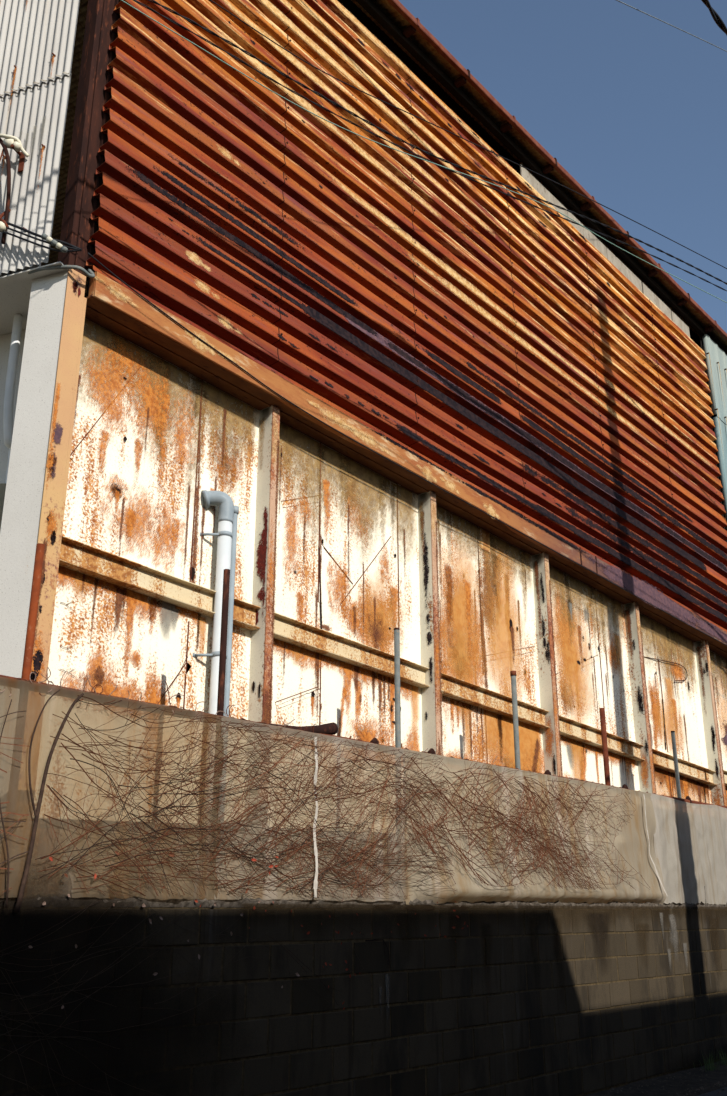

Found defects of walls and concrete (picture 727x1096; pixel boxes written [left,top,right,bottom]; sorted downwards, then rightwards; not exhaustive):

rust [74,332,243,584]
rust [57,566,172,706]
rust [175,605,206,654]
rust [262,424,420,752]
rust [432,516,545,774]
rust [547,568,636,785]
rust [637,617,710,804]
rust [708,656,727,806]